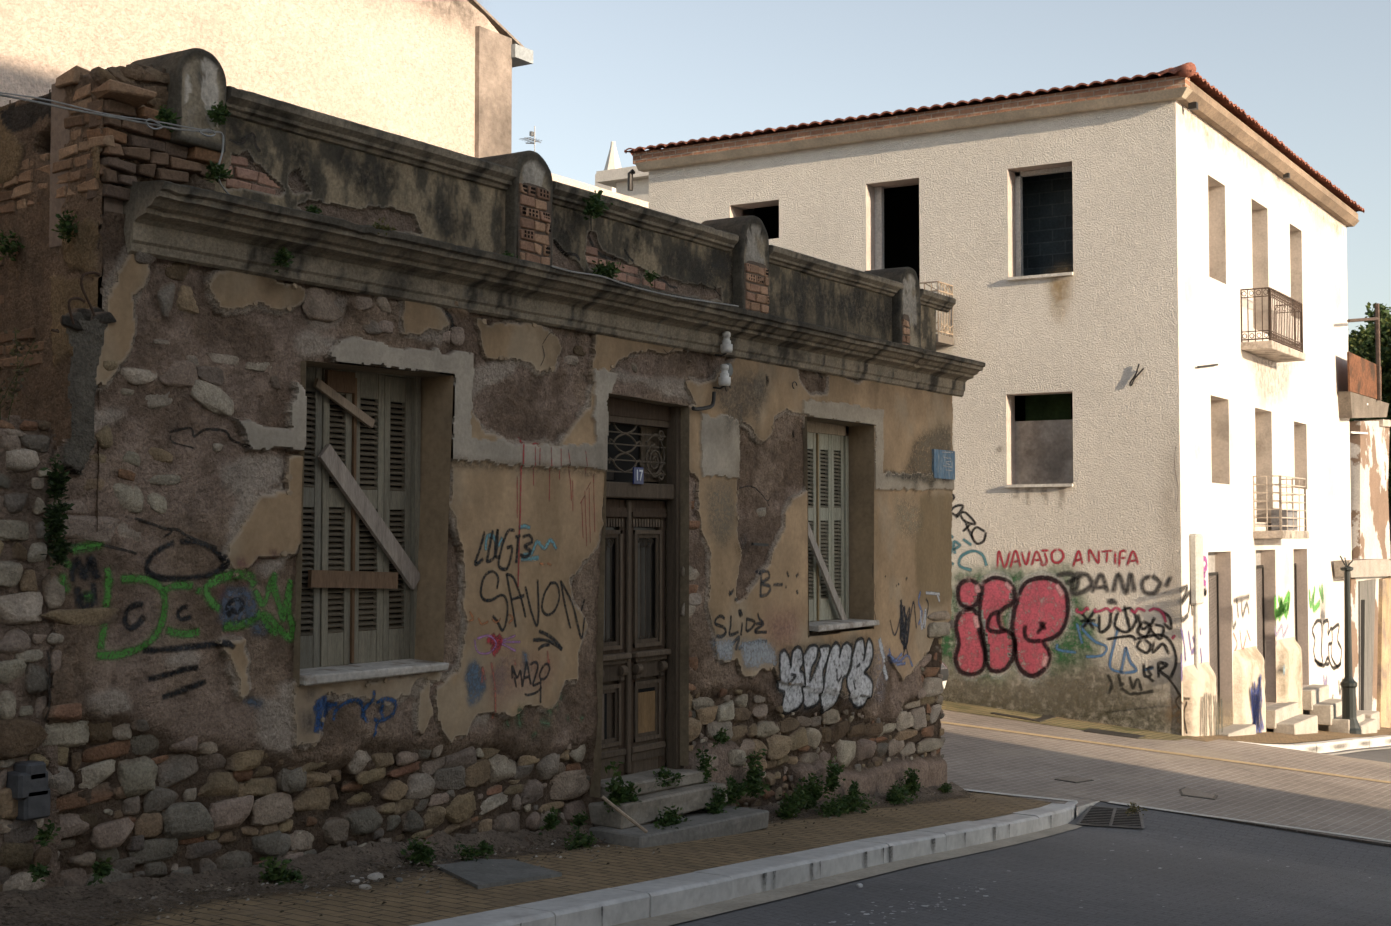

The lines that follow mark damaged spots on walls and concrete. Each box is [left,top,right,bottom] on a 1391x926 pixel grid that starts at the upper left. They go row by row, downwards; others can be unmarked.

flaking render [518,183,552,265]
flaking render [797,369,830,395]
flaking render [48,211,733,778]
flaking render [736,408,809,601]
flaking render [689,452,927,723]
flaking render [684,740,756,803]
flaking render [791,757,947,804]